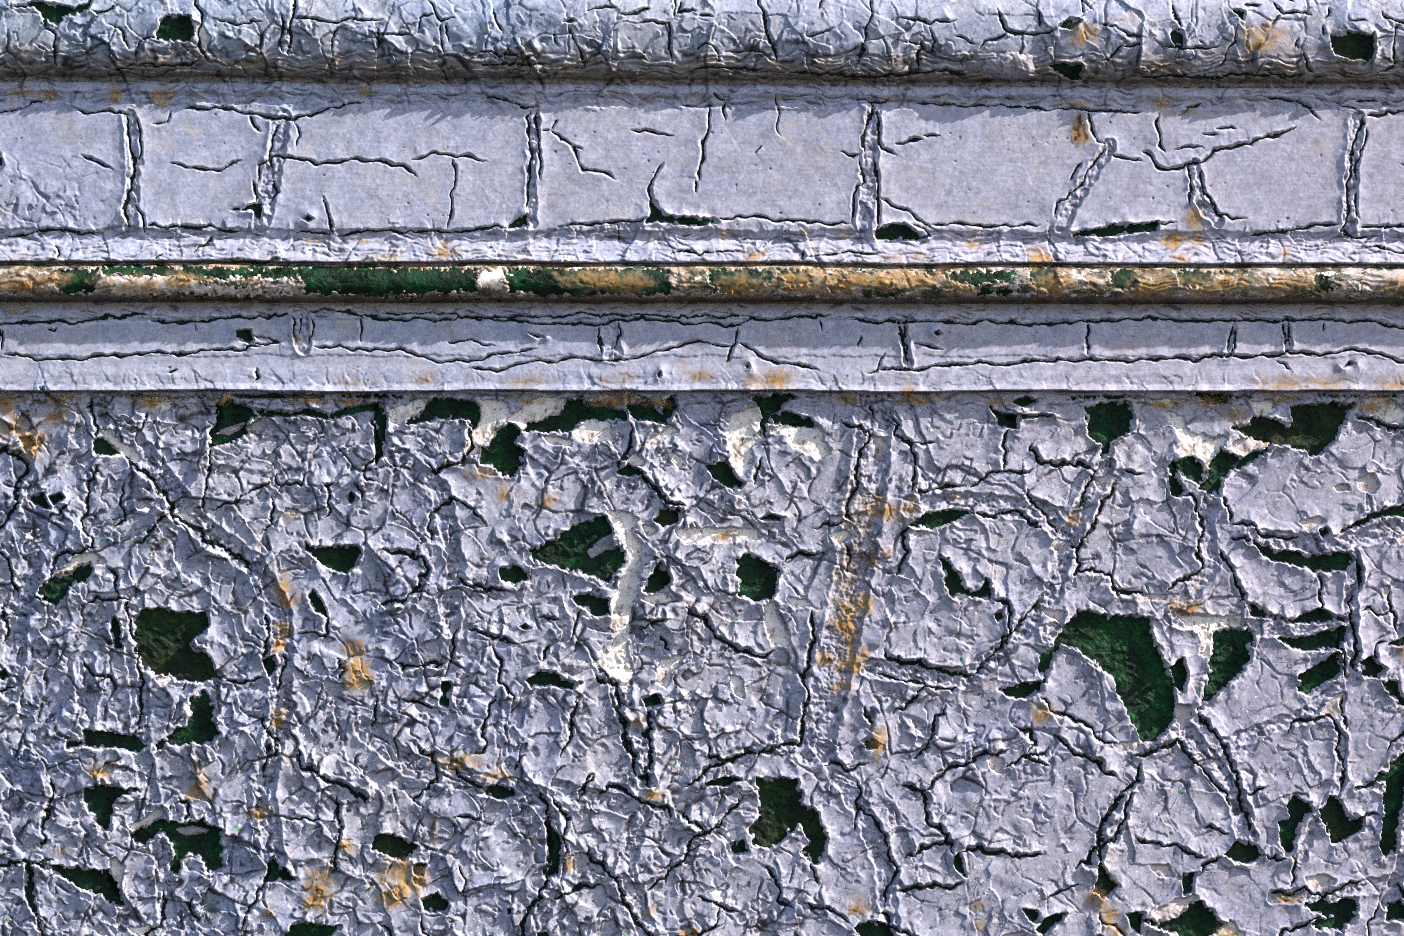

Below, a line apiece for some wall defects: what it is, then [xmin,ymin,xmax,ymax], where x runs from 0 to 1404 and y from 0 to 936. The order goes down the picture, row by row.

crack [0,0,1404,264]
peeling [67,607,221,752]
crack [0,397,381,728]
crack [225,608,369,873]
peeling [209,393,684,477]
crack [371,610,581,820]
peeling [499,508,790,707]
crack [0,308,1404,609]
peeling [706,777,827,864]
crack [518,576,1404,936]
peeling [999,604,1346,752]
peeling [1071,392,1404,497]